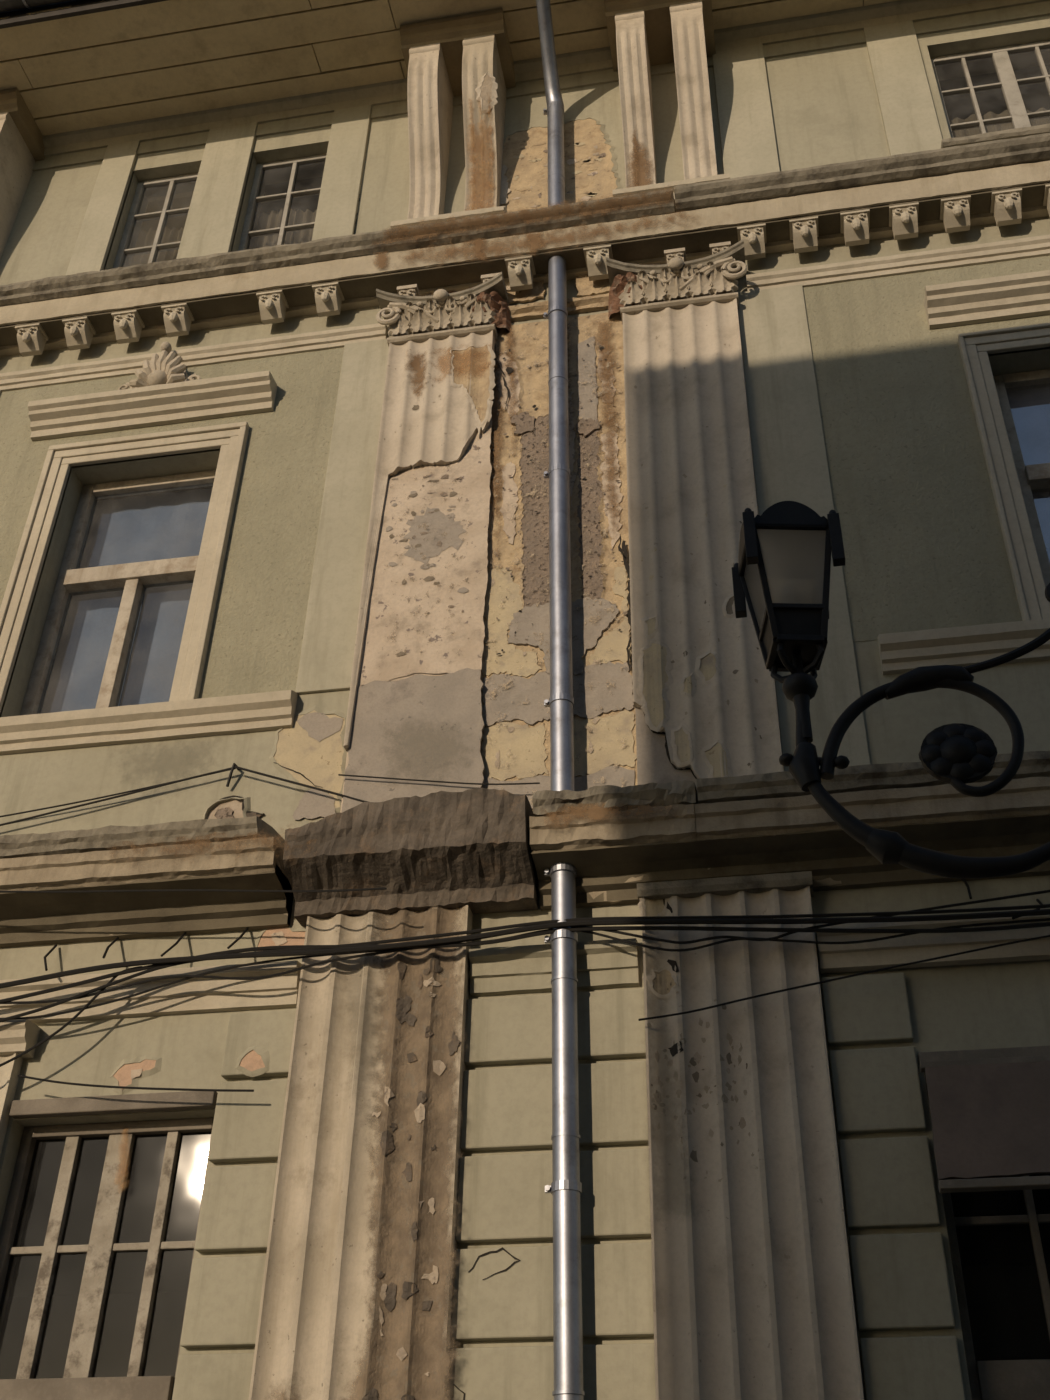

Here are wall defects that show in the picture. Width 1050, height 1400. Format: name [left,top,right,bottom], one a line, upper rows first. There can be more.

flaking render [475,71,498,114]
rust [374,107,687,269]
flaking render [500,117,623,213]
flaking render [358,281,550,810]
flaking render [567,272,751,787]
flaking render [202,795,265,819]
peeling [109,1055,162,1095]
water stain [350,906,461,1400]